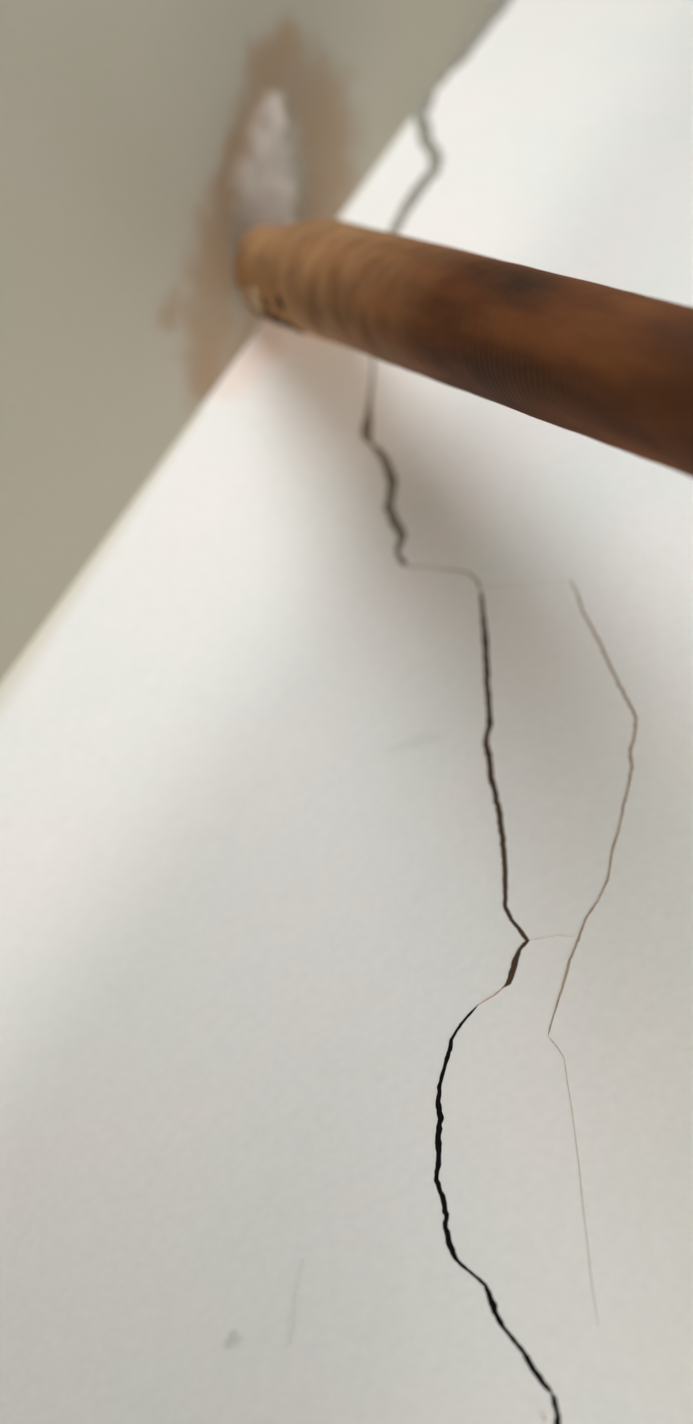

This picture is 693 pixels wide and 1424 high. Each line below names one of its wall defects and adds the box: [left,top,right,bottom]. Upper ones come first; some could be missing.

crack [389,0,511,234]
damp [201,319,298,414]
crack [361,357,638,1424]